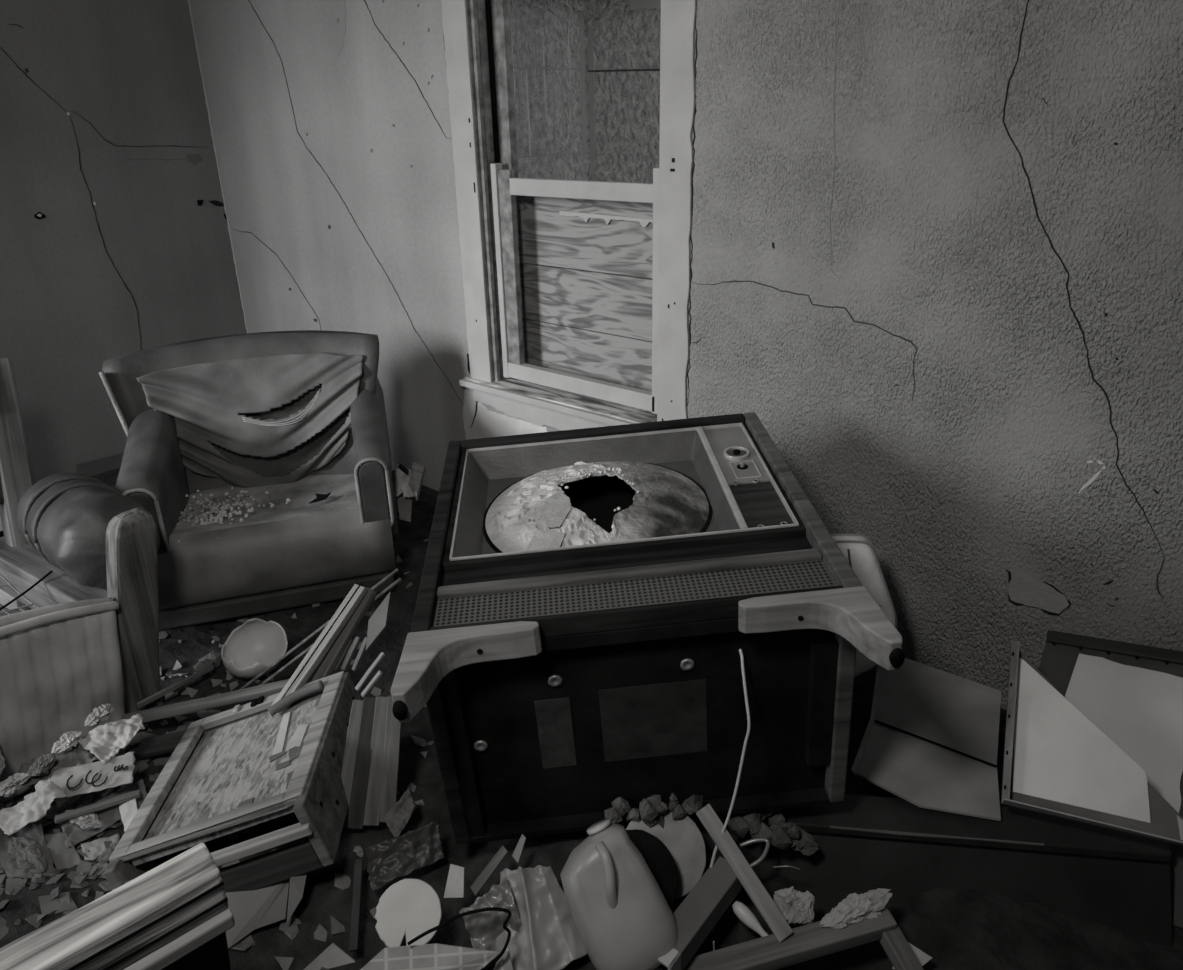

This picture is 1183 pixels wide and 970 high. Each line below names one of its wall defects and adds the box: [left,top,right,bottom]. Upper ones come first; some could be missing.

crack [0,24,195,340]
crack [233,229,321,329]
crack [248,0,478,428]
crack [687,0,918,406]
crack [1002,0,1165,598]
crack [1006,570,1070,615]